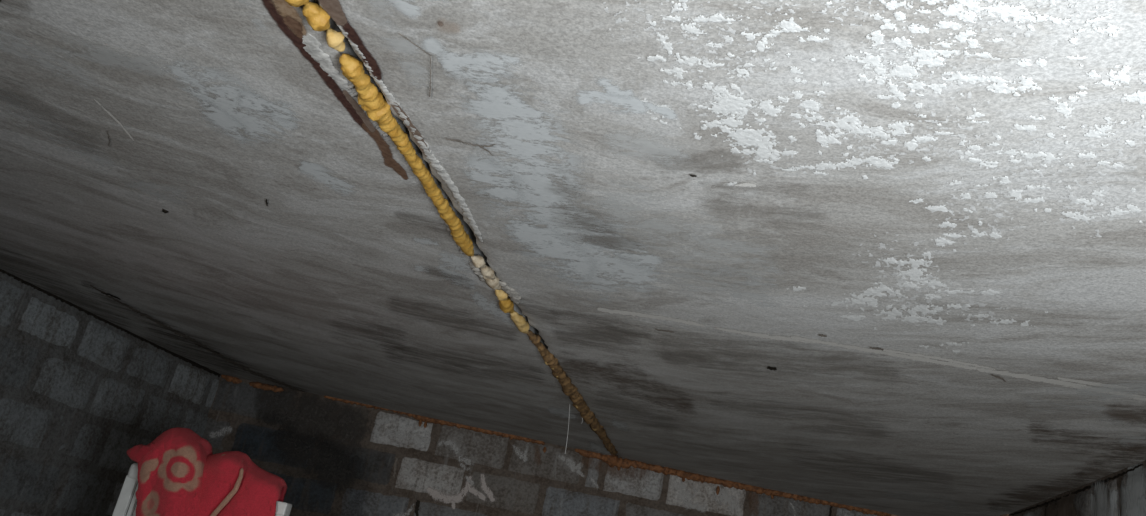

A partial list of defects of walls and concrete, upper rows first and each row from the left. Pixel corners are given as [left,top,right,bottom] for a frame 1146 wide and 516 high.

corrosion [262,0,409,180]
crack [399,34,431,97]
crack [447,139,495,156]